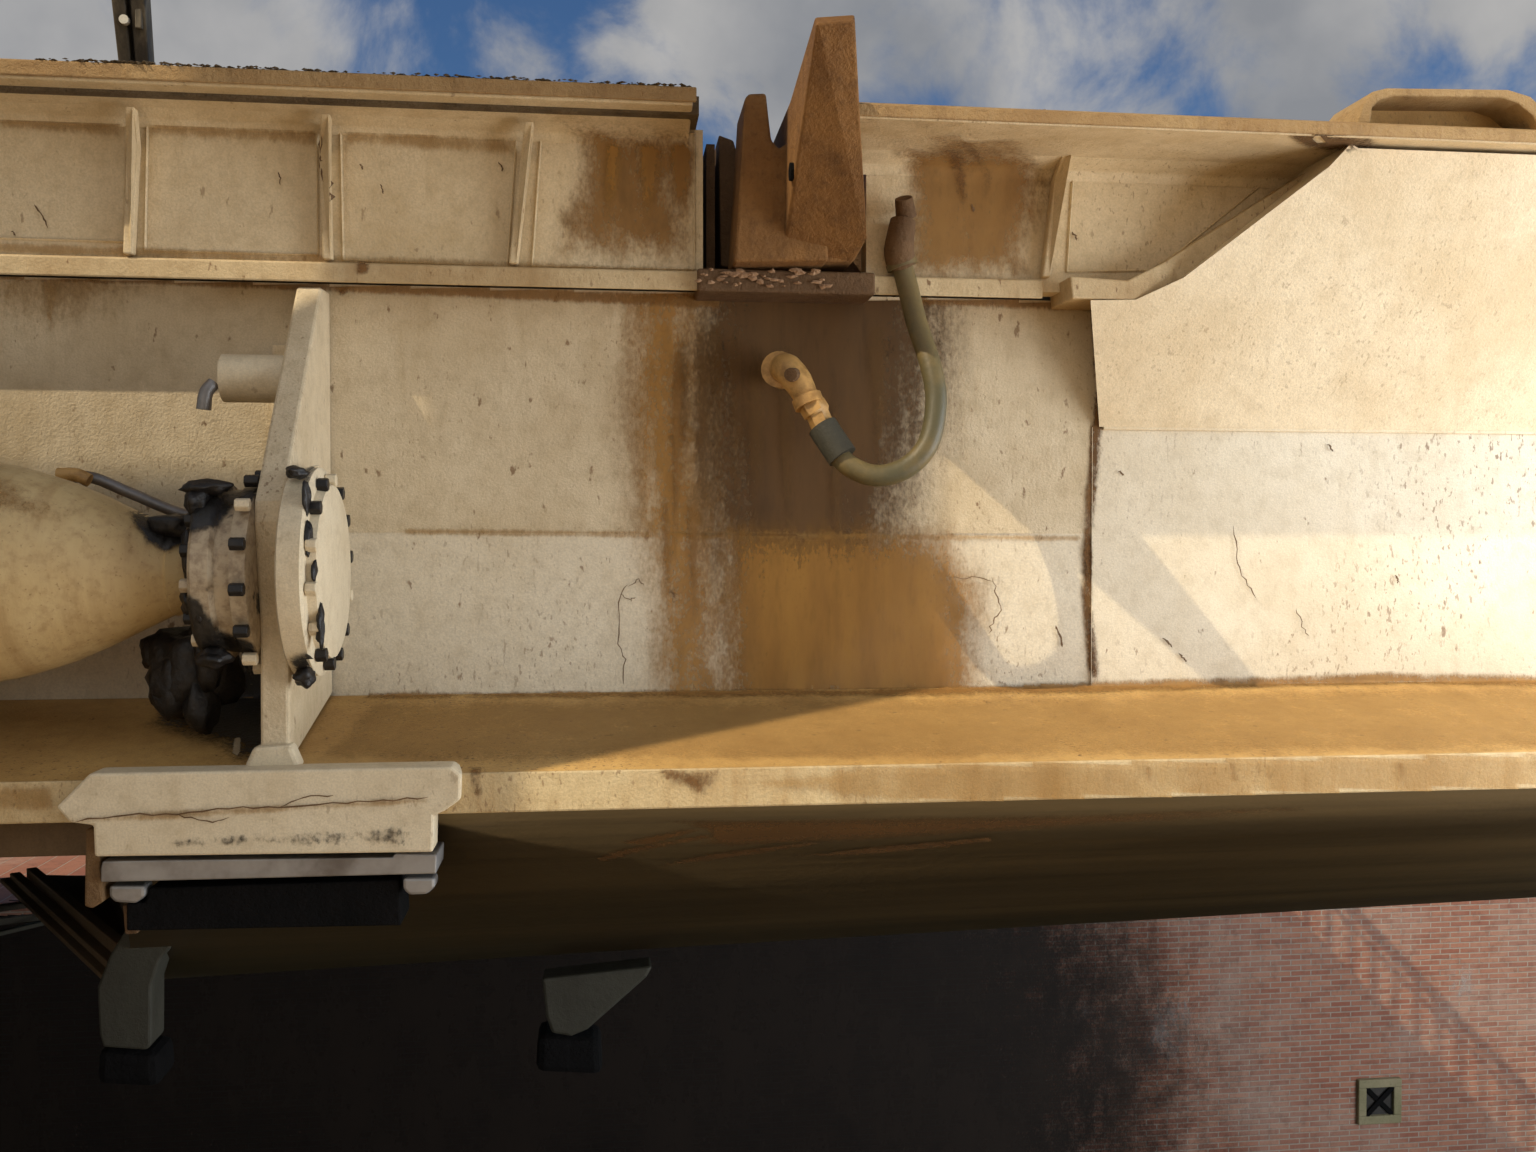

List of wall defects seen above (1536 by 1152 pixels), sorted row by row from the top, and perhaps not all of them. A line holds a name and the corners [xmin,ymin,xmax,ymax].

corrosion [563,130,693,255]
corrosion [910,141,1043,275]
corrosion [1292,134,1372,152]
corrosion [0,261,1536,697]
crack [77,795,428,823]
corrosion [664,770,712,792]